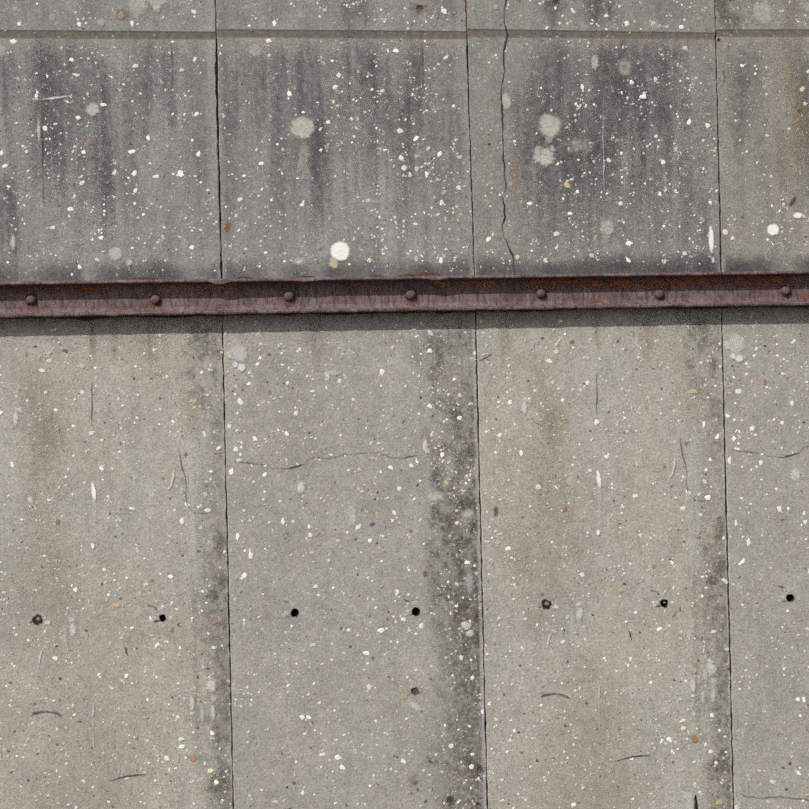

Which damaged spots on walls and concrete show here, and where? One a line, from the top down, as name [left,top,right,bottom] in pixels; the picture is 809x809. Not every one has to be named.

leakage [617,53,648,140]
crack [499,0,515,274]
leakage [544,260,716,274]
corrosion [526,277,719,290]
corrosion [0,299,598,321]
corrosion [604,295,809,310]
leakage [428,481,483,809]